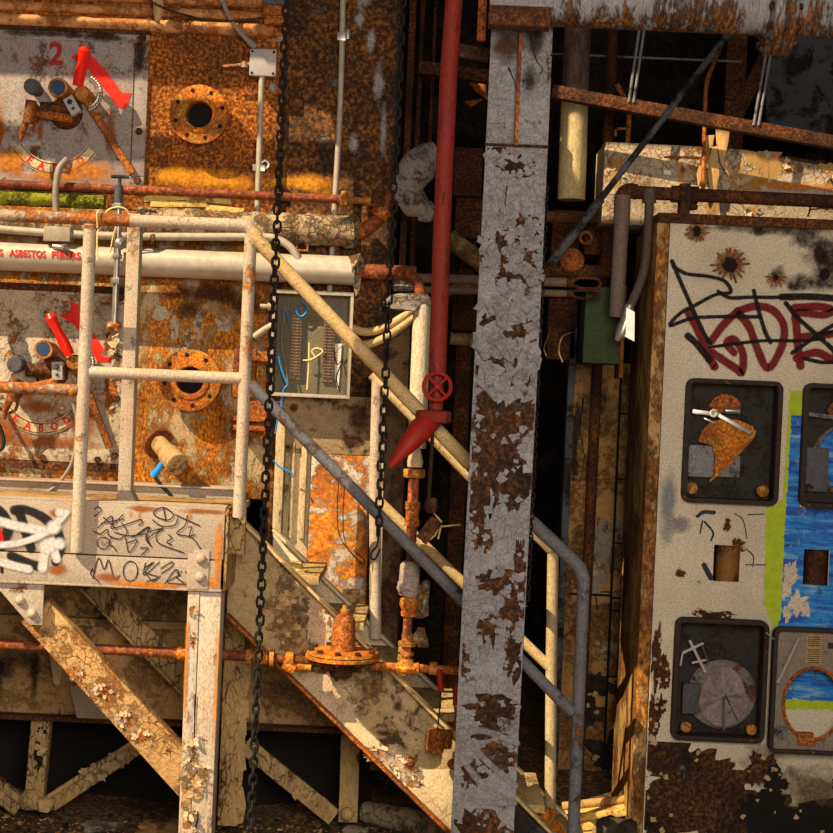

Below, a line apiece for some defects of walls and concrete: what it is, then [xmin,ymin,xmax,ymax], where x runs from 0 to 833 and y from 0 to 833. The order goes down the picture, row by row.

corrosion [158,167,250,188]
corrosion [282,174,328,190]
peeling [483,147,537,179]
crack [807,179,833,217]
corrosion [164,284,242,316]
peeling [466,207,545,560]
peeling [469,539,527,686]
peeling [782,560,810,624]
peeling [91,683,113,699]
peeling [456,643,521,792]
spalling [0,709,221,833]
spalling [242,730,346,806]